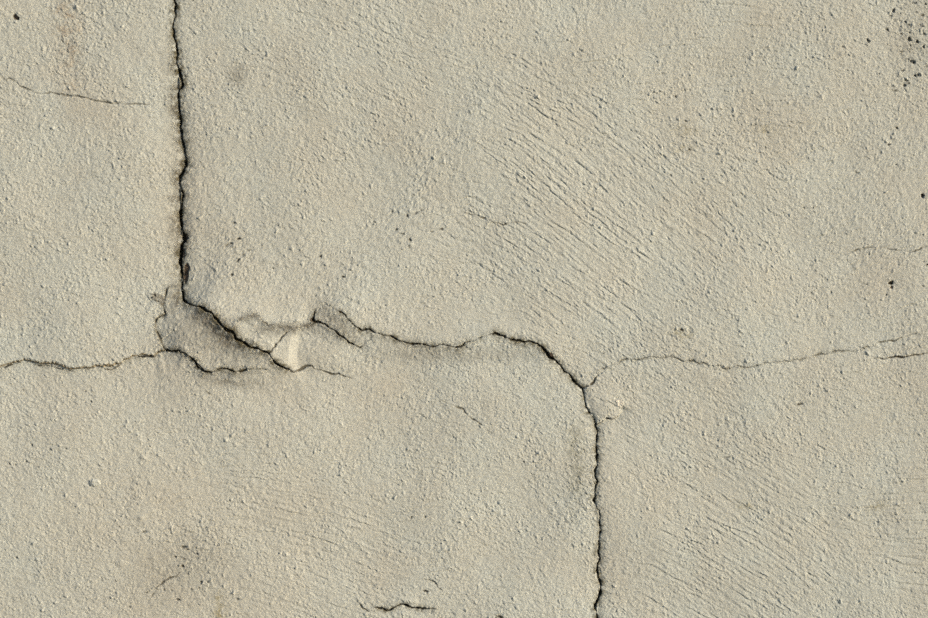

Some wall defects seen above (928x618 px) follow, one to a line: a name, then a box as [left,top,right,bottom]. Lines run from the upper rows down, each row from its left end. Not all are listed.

crack [155,0,603,618]